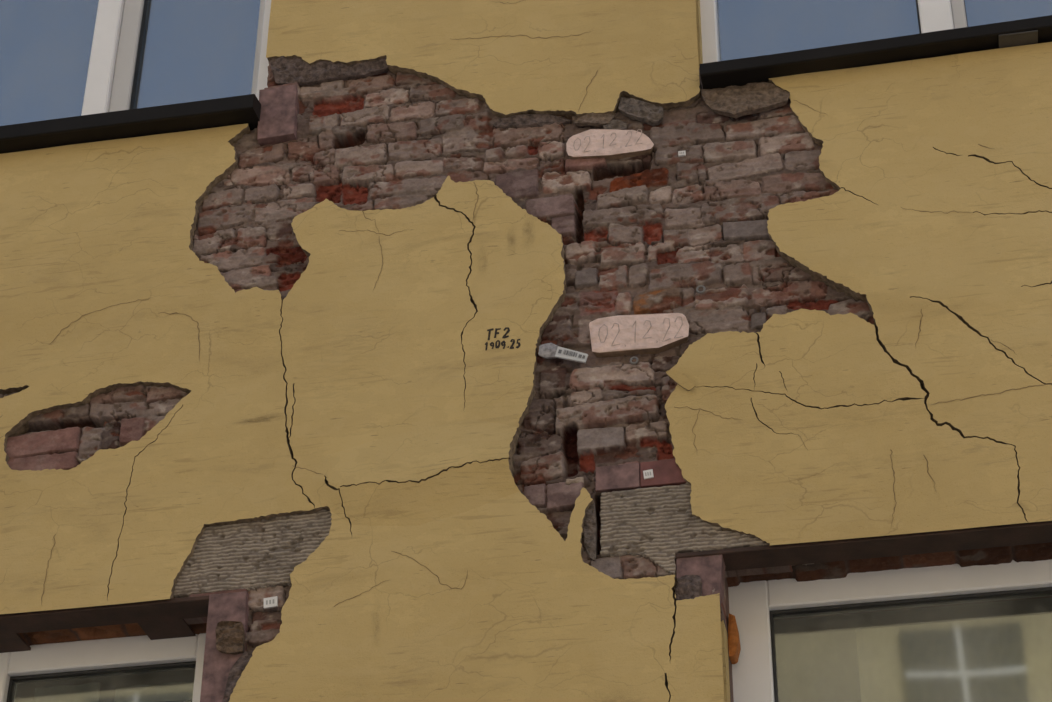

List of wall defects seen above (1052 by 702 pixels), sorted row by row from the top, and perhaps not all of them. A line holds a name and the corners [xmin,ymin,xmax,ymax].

crack [841,144,1052,215]
crack [339,211,404,290]
crack [433,182,479,408]
spalling [170,55,875,634]
spalling [0,381,191,471]
crack [279,299,510,535]
crack [675,296,1052,525]
crack [107,405,183,601]
crack [391,551,468,589]
spalling [184,585,292,702]
crack [665,577,678,702]